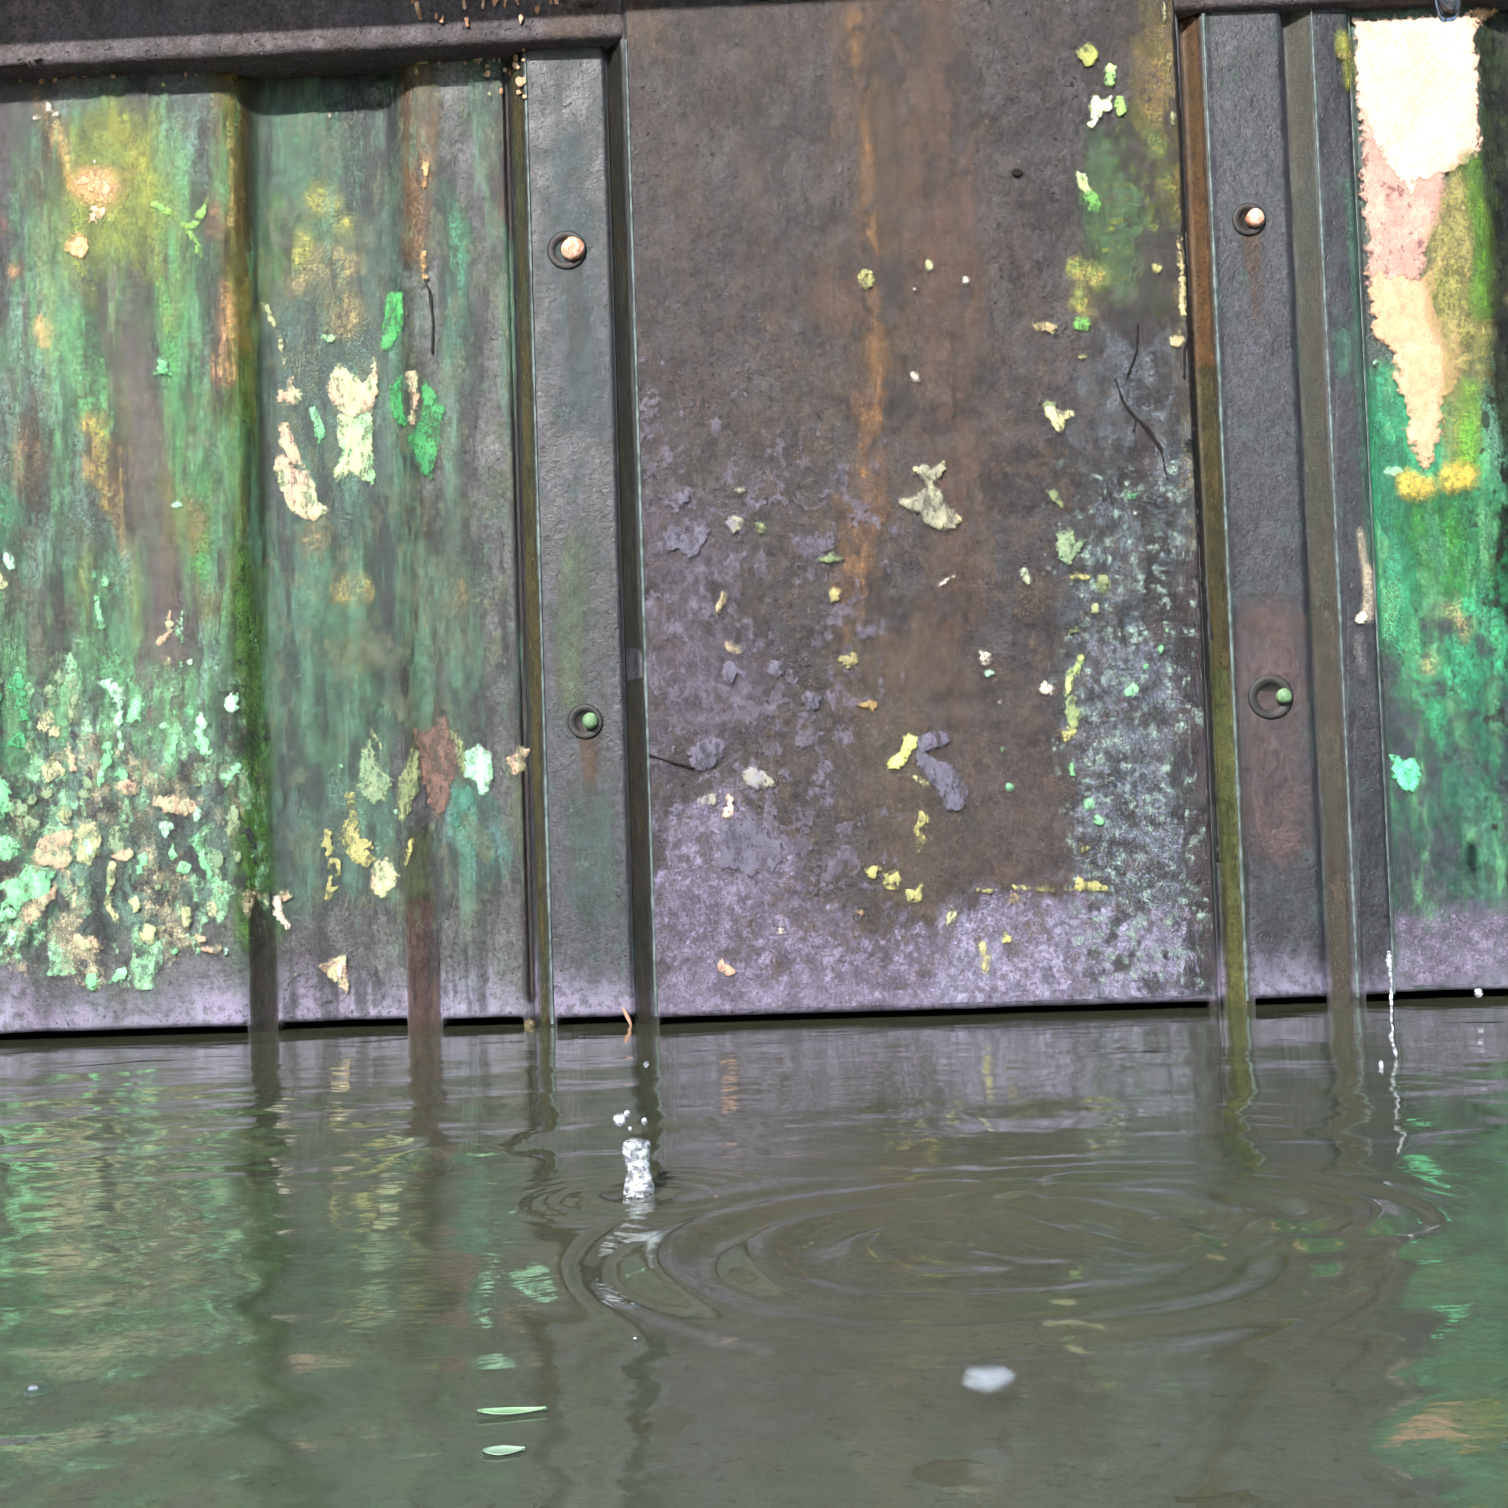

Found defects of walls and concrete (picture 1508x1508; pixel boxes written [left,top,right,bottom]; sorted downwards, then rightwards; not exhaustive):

peeling [0,668,243,955]
water stain [0,72,401,1039]
peeling [263,291,445,522]
corrosion [402,62,436,266]
corrosion [405,826,440,1028]
peeling [340,715,530,829]
water stain [485,65,535,1001]
corrosion [609,0,1247,1026]
crack [1114,22,1220,861]
corrosion [1286,9,1351,1003]
peeling [1339,6,1497,476]
water stain [1336,10,1508,1058]